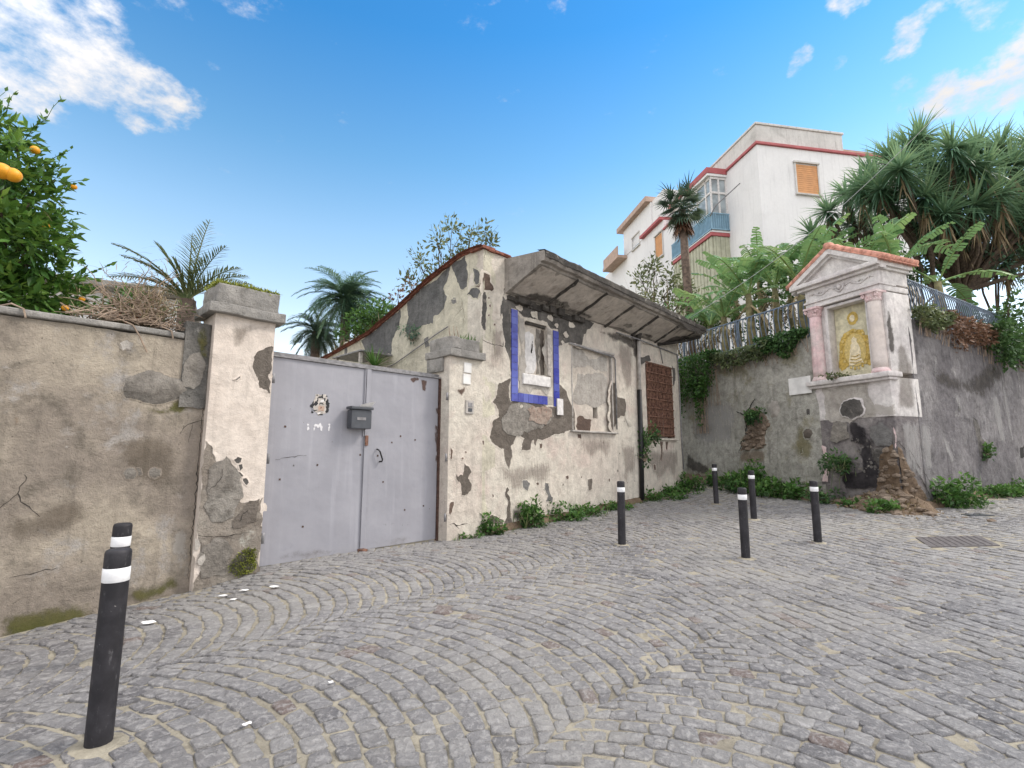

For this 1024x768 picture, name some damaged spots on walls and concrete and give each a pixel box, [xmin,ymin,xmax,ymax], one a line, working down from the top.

peeling [232,343,273,394]
peeling [344,255,596,472]
crack [0,475,40,517]
peeling [192,440,267,592]
peeling [446,447,473,517]
spalling [830,397,928,501]